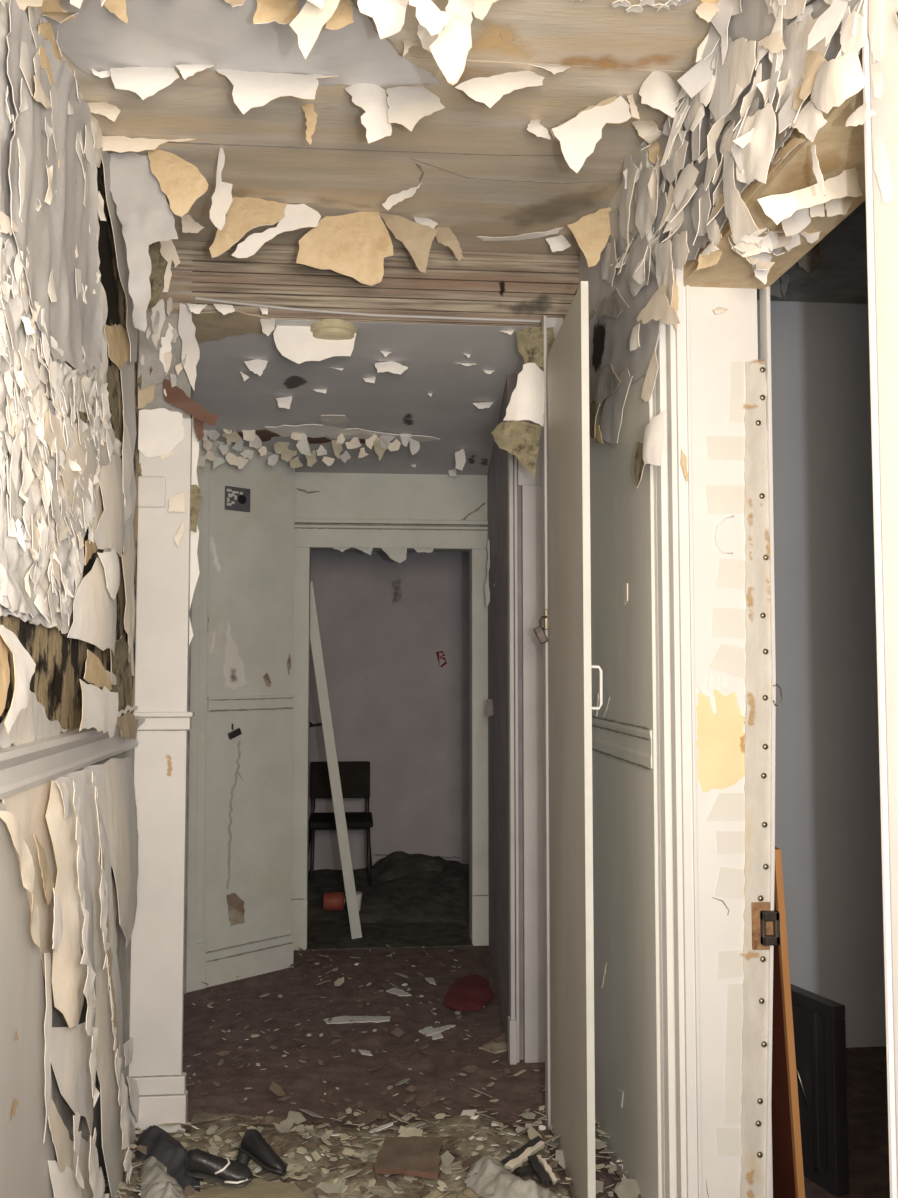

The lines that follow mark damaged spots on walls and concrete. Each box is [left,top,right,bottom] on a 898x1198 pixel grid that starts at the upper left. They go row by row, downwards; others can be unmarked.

peeling [477,0,877,488]
peeling [0,0,570,748]
spalling [592,693,610,717]
spalling [696,673,746,792]
crack [226,740,243,889]
peeling [0,757,578,1198]
peeling [595,1114,642,1198]